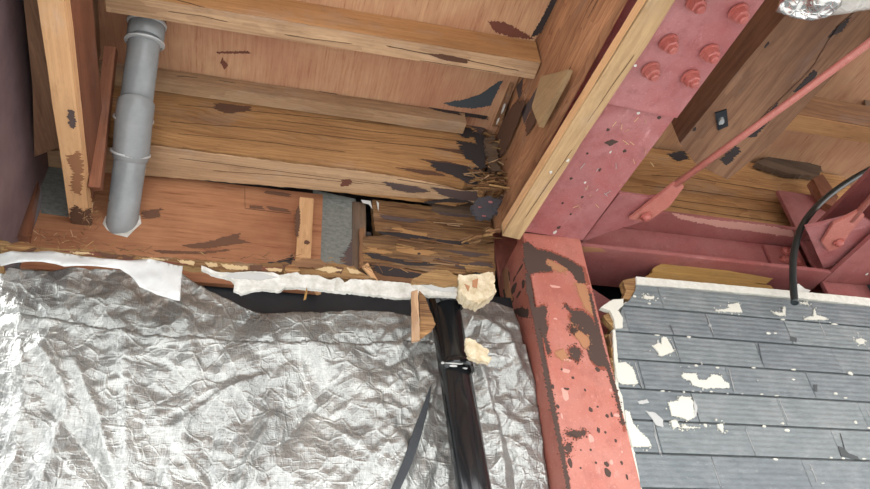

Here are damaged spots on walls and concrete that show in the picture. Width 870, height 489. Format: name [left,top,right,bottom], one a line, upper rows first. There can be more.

damp [496,78,538,158]
damp [382,81,503,221]
damp [66,151,93,226]
damp [154,233,250,254]
damp [339,231,495,278]
spalling [714,302,743,315]
spalling [800,300,831,323]
rust [503,242,627,489]
spalling [599,278,659,489]
spalling [650,336,675,357]
spalling [666,372,729,434]
spalling [838,446,860,460]